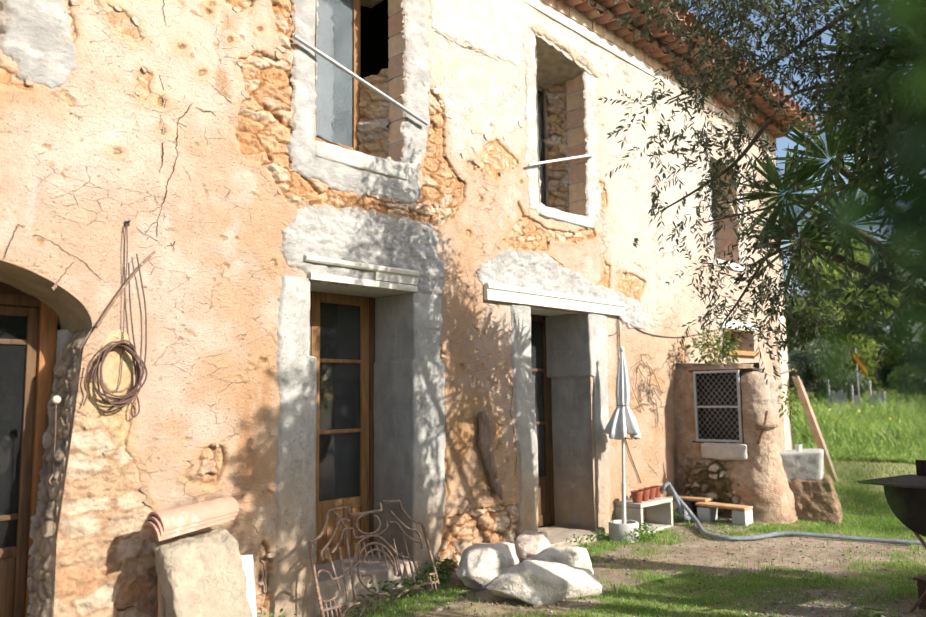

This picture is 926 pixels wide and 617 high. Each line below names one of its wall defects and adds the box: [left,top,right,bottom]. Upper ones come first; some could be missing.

spalling [106,4,141,43]
crack [160,0,168,27]
hole [226,0,252,13]
spalling [135,67,164,107]
spalling [235,0,525,226]
crack [136,69,244,251]
spalling [502,204,601,253]
crack [1,224,102,290]
spalling [598,264,647,301]
spalling [185,445,224,486]
spalling [52,382,158,617]
spalling [436,502,520,574]